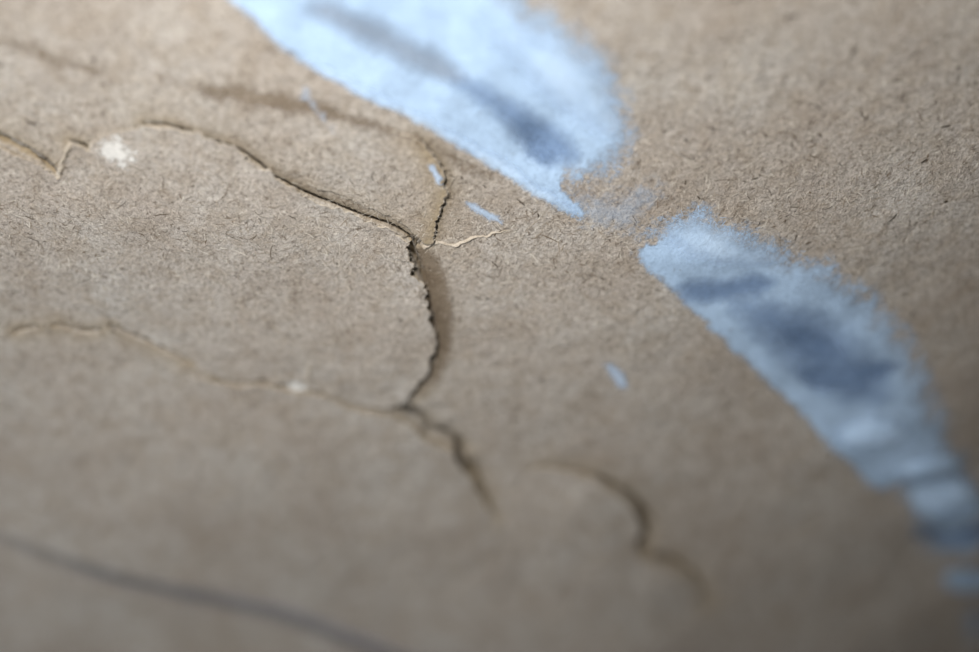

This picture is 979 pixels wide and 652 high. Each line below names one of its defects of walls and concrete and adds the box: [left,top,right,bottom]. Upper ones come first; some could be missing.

crack [0,132,58,175]
crack [72,141,89,150]
crack [146,121,498,519]
crack [543,464,712,607]